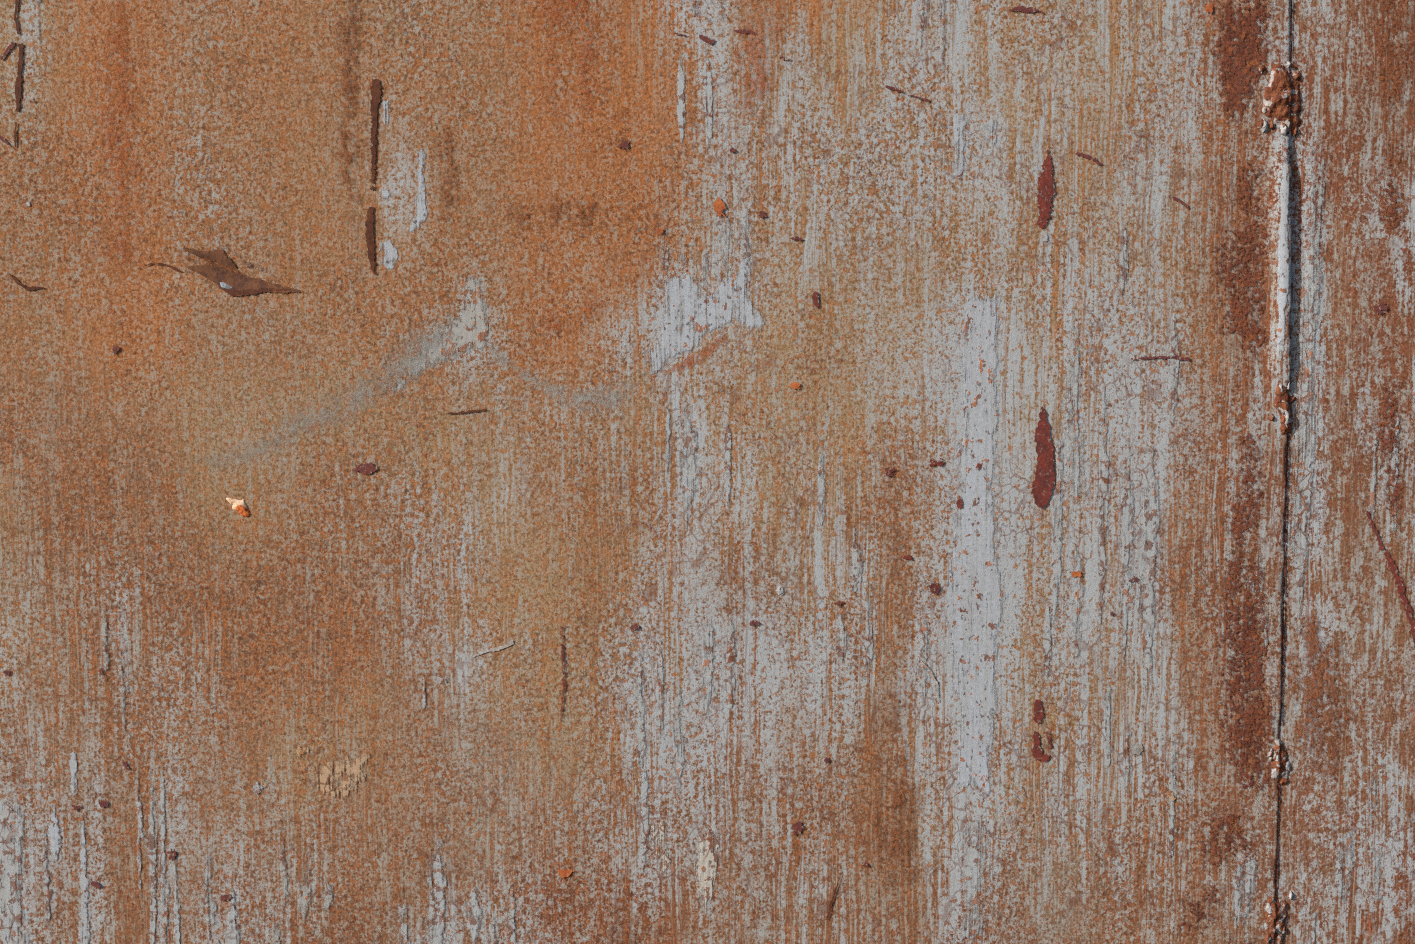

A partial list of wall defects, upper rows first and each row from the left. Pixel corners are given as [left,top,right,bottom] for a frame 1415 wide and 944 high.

peeling [676,59,686,142]
peeling [649,210,767,377]
peeling [1036,146,1055,242]
corrosion [1205,0,1272,133]
corrosion [1210,162,1269,359]
corrosion [1378,0,1413,229]
peeling [928,294,1006,794]
peeling [1031,324,1160,693]
corrosion [1374,380,1407,524]
corrosion [1216,433,1350,895]
peeling [693,829,719,917]
corrosion [1177,808,1255,944]